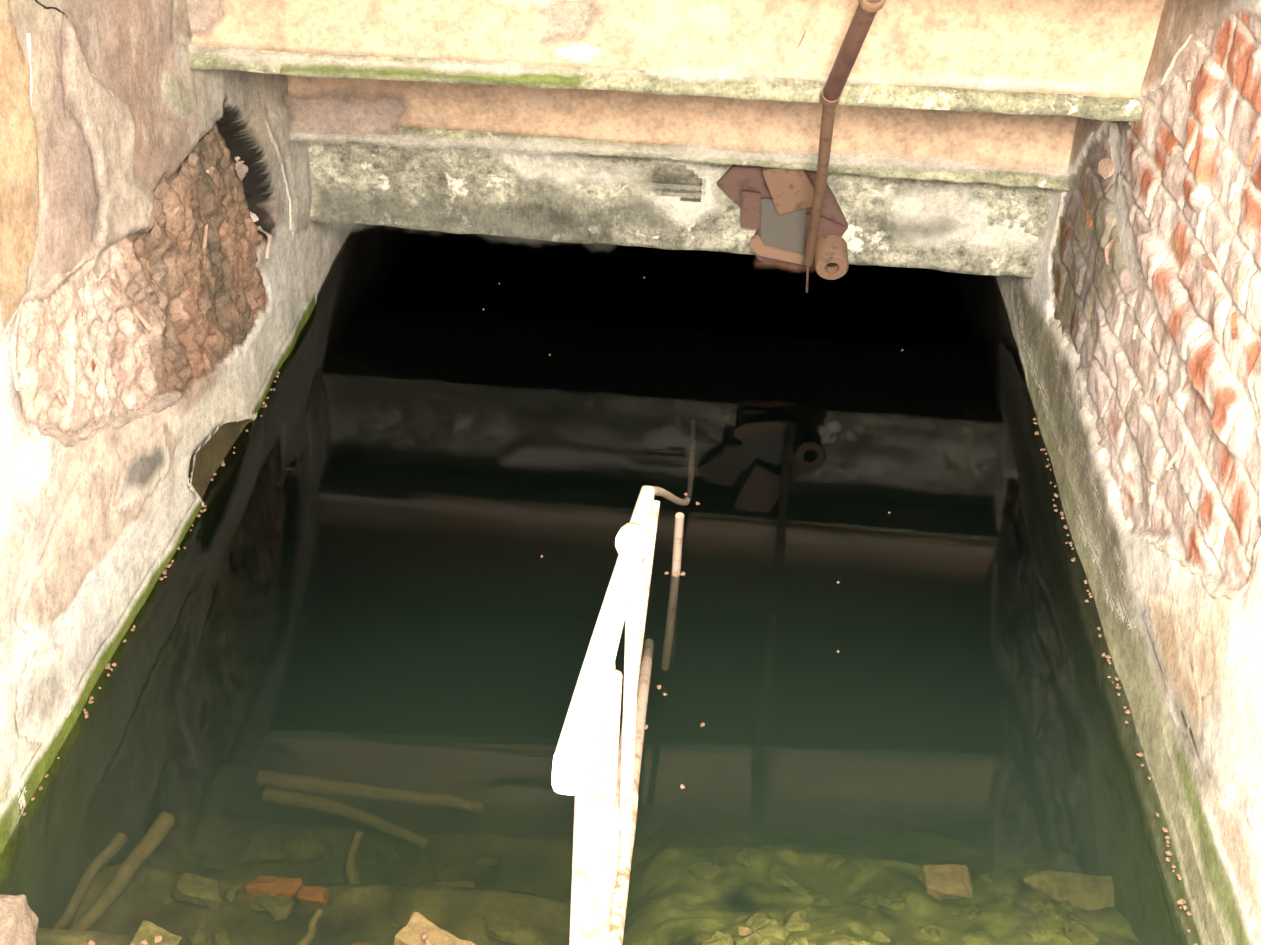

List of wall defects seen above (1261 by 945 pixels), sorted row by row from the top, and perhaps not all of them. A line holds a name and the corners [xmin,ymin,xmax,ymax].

spalling [0,0,273,644]
spalling [1052,12,1261,600]
leakage [15,644,76,746]